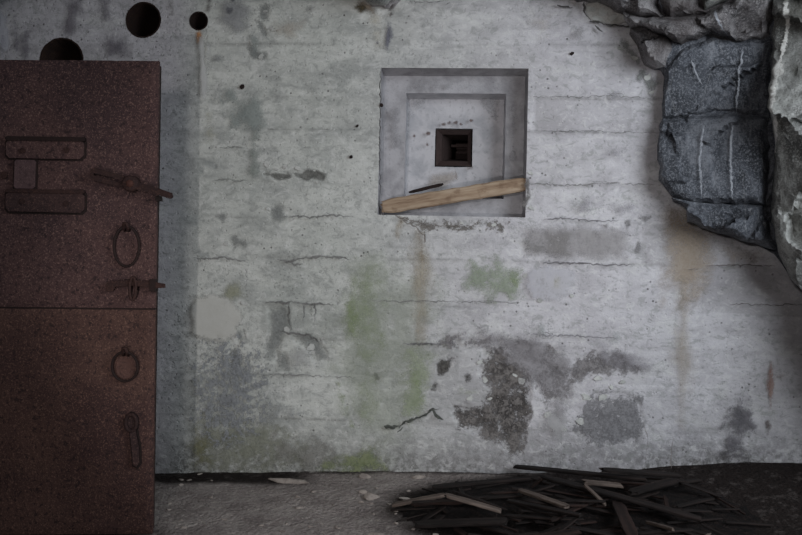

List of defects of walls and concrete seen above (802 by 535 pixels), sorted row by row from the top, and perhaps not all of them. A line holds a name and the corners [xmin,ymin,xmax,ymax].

spalling [586,2,626,26]
spalling [264,161,325,184]
spalling [401,217,510,233]
crack [267,301,330,342]
leakage [475,327,576,420]
crack [384,408,443,432]
leakage [719,398,757,464]